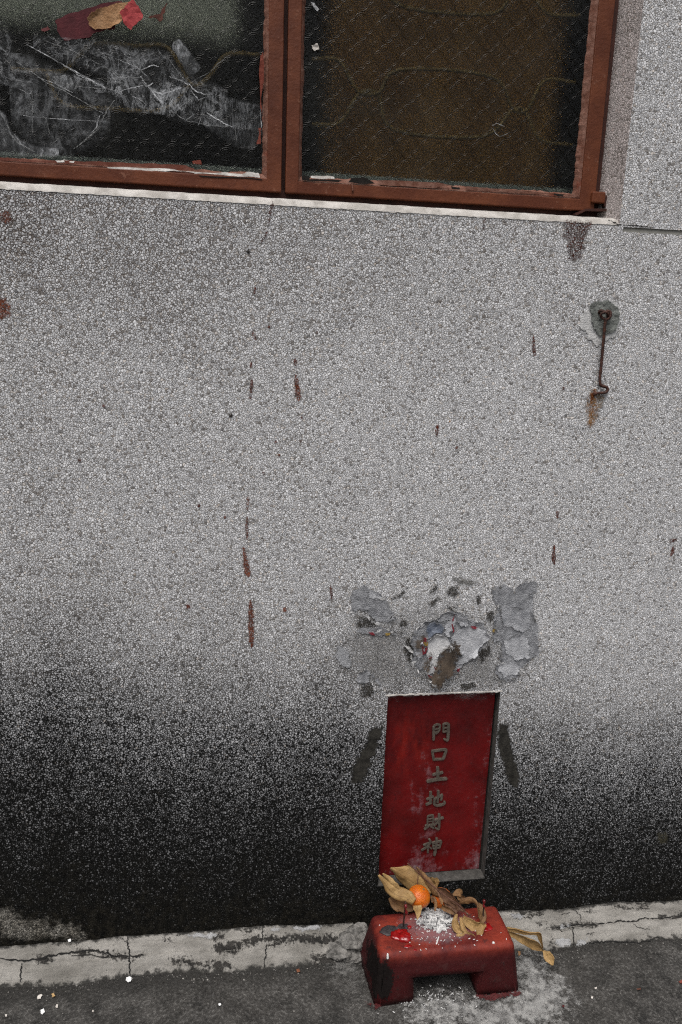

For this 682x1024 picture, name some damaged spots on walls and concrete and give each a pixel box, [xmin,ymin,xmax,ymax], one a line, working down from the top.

corrosion [587,389,604,427]
corrosion [242,497,251,577]
peeling [350,579,541,690]
crack [555,903,682,945]
crack [1,935,142,982]